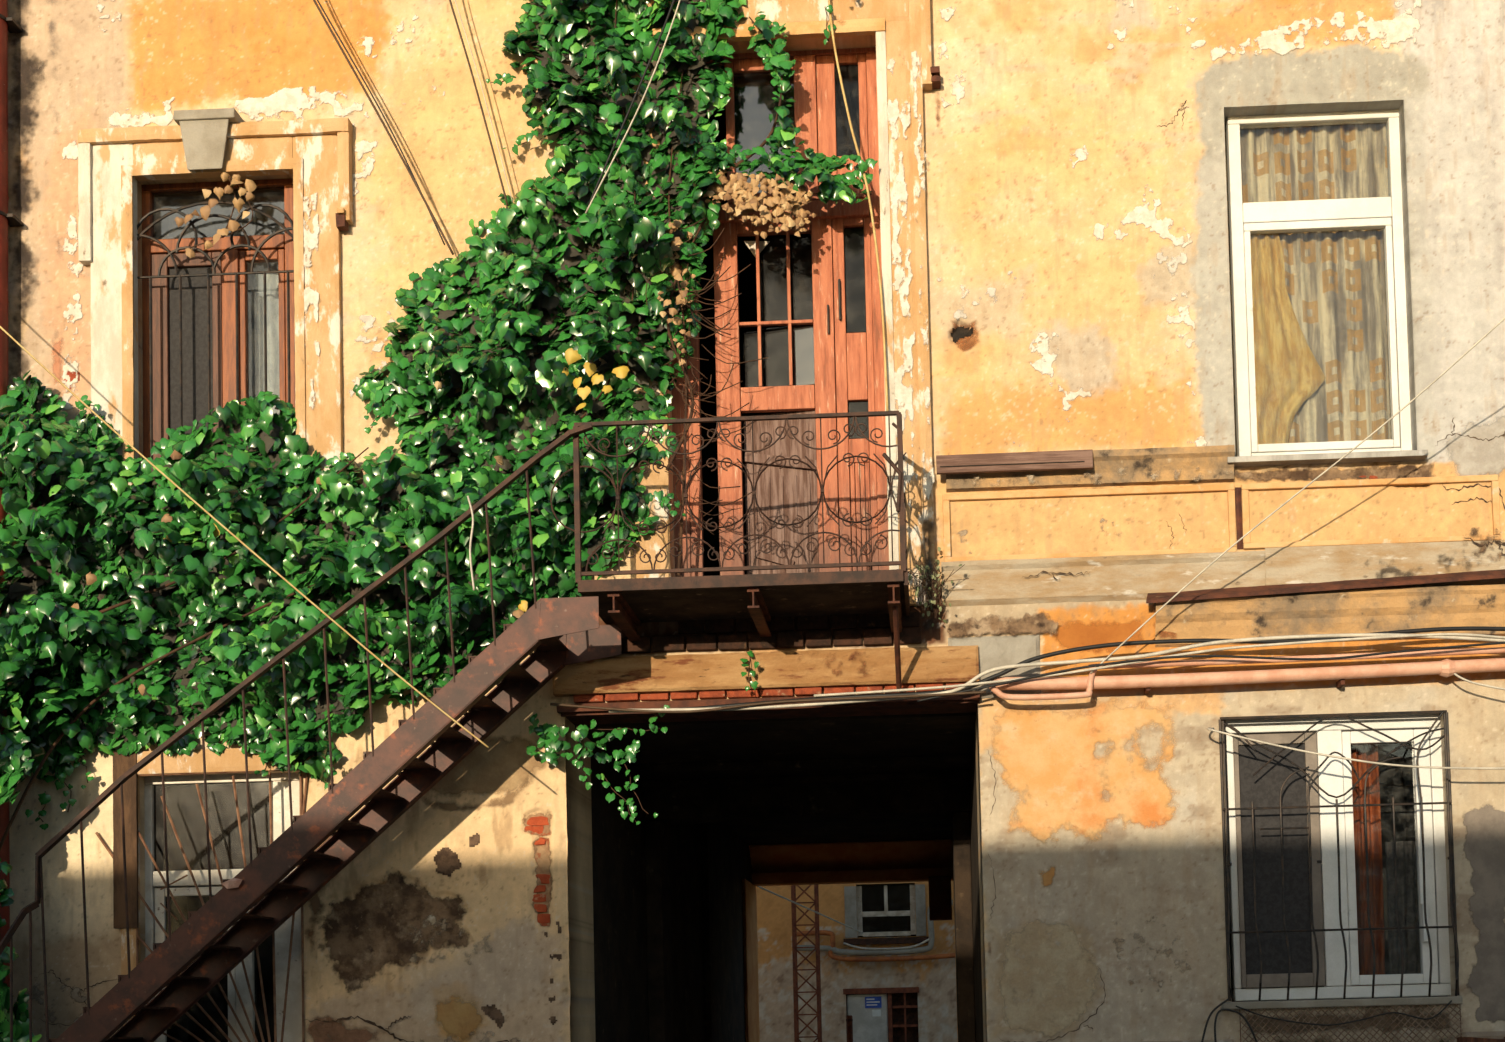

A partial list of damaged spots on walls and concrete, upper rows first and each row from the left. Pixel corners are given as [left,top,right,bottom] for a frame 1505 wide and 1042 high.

peeling [1169,0,1422,61]
leakage [10,0,44,213]
leakage [10,239,35,378]
peeling [887,42,965,508]
peeling [1093,187,1192,276]
peeling [1029,332,1091,422]
peeling [947,612,1175,843]
flaking render [319,871,491,993]
flaking render [434,833,480,877]
flaking render [523,813,562,961]
flaking render [307,1016,376,1042]
crack [306,1015,414,1042]